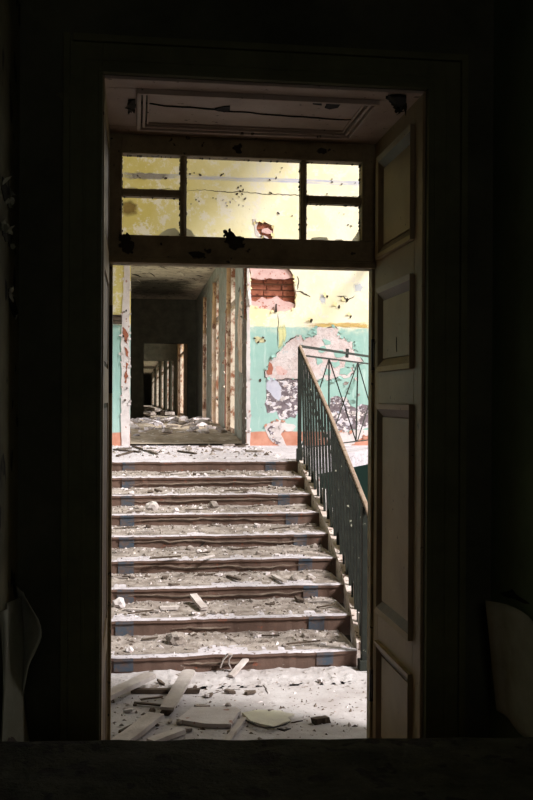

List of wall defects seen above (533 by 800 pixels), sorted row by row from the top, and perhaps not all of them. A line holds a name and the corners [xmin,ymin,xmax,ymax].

crack [141,102,351,121]
peeling [386,94,407,116]
crack [162,188,310,196]
spalling [252,219,275,239]
spalling [119,265,166,446]
peeling [237,268,368,446]